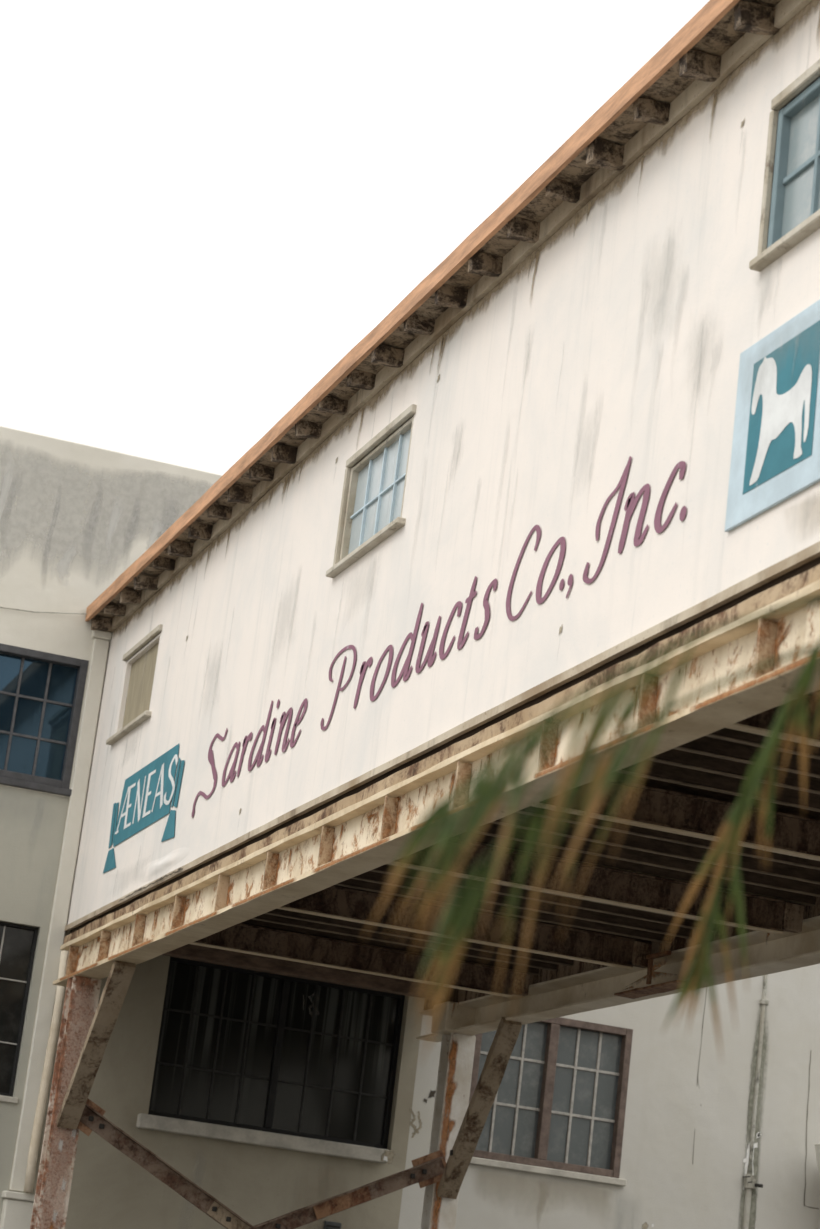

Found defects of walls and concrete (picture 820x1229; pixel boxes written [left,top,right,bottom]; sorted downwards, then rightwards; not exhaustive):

corrosion [694,630,820,710]
corrosion [314,796,419,872]
corrosion [439,1040,457,1158]
corrosion [431,1181,442,1229]